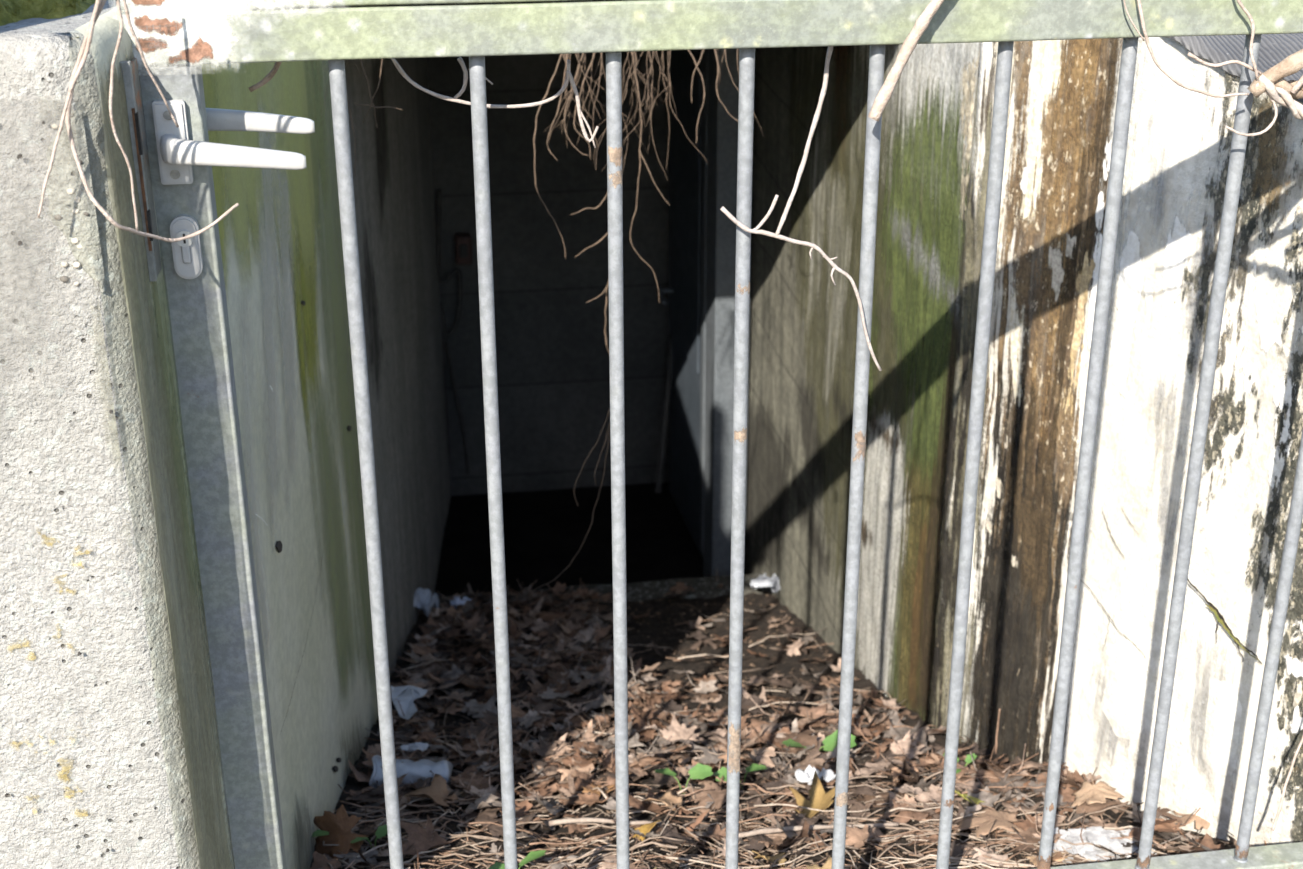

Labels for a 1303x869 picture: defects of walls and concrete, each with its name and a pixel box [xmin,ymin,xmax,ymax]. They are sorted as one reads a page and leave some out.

leakage [215,61,353,686]
leakage [745,389,828,571]
leakage [803,37,1149,774]
crack [1188,579,1263,665]
leakage [1182,72,1303,843]